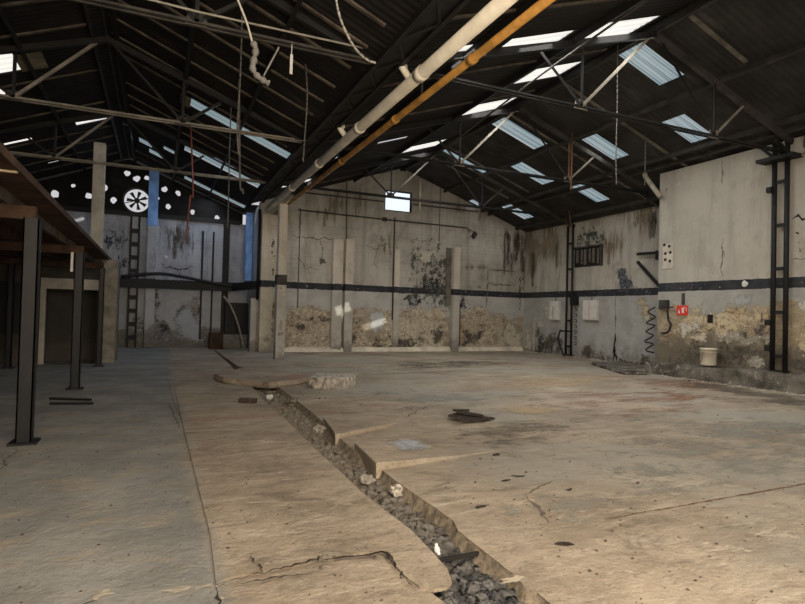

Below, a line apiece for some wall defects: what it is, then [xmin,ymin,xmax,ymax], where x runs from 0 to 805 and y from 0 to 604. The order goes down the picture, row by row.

mould [399,238,449,312]
damp [501,228,558,287]
spalling [277,284,330,347]
spalling [341,306,449,347]
spalling [460,305,507,347]
peeling [668,294,778,346]
crack [215,551,417,604]